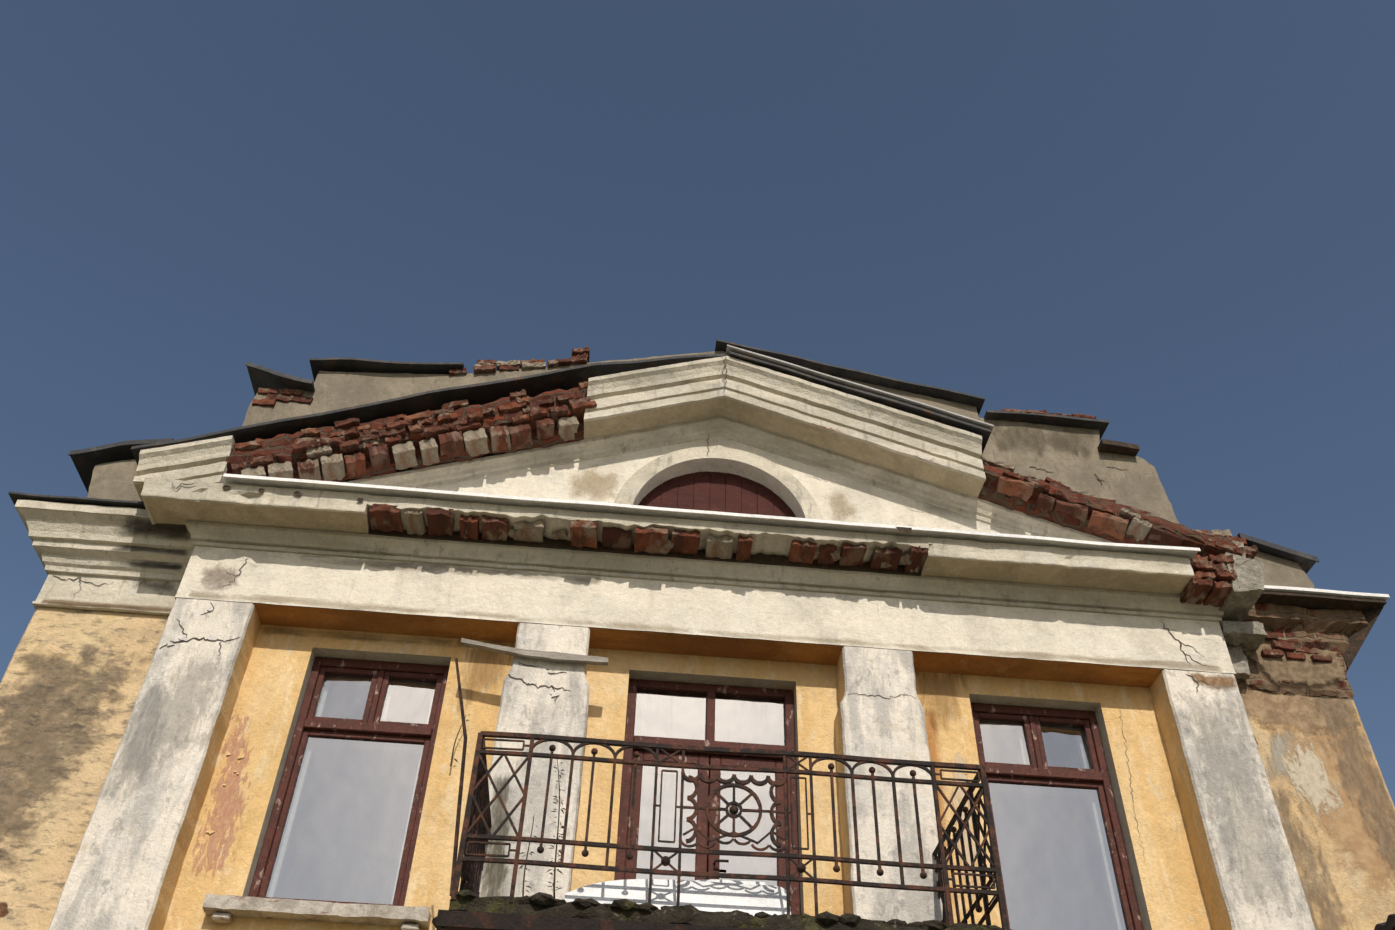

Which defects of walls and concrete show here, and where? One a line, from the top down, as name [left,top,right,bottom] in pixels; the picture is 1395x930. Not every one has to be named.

water stain [42,599,172,611]
water stain [115,518,189,590]
crack [159,559,247,656]
water stain [206,568,235,587]
crack [1162,622,1217,692]
peeling [192,716,251,876]
flaking render [1239,632,1395,890]
spalling [0,902,9,917]